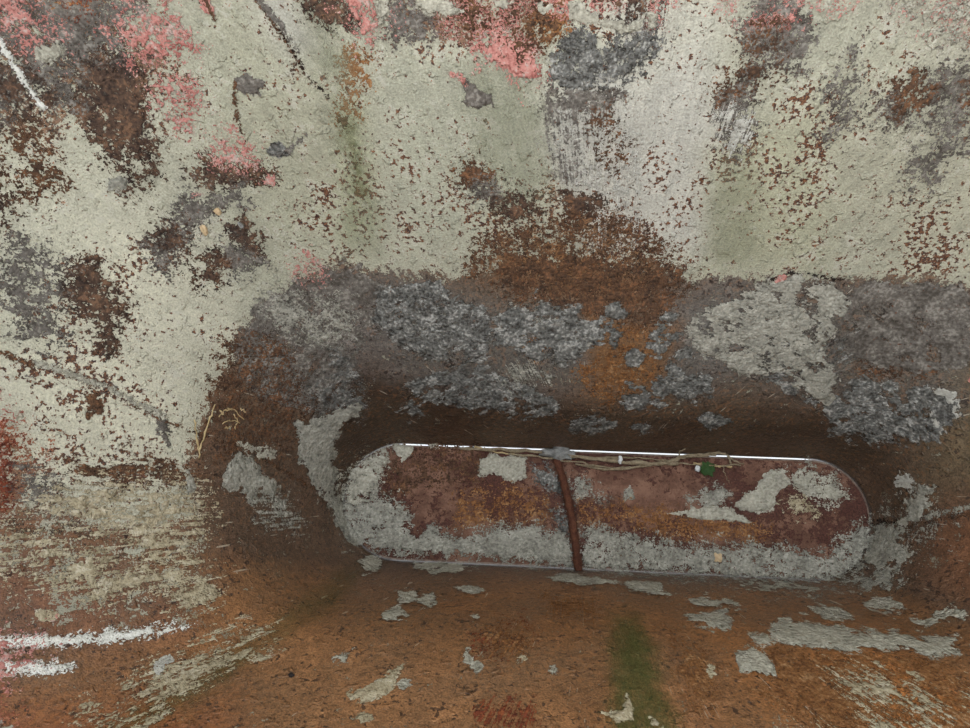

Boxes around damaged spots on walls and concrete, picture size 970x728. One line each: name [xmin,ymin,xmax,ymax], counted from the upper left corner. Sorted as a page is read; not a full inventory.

peeling [0,0,223,144]
peeling [266,132,307,159]
rust [802,26,970,214]
peeling [130,168,259,285]
rust [447,88,700,417]
peeling [929,386,961,435]
rust [376,437,783,547]
crack [872,503,970,530]
peeling [381,587,437,621]
rust [472,691,547,728]
leakage [618,619,670,728]
rust [740,623,970,728]